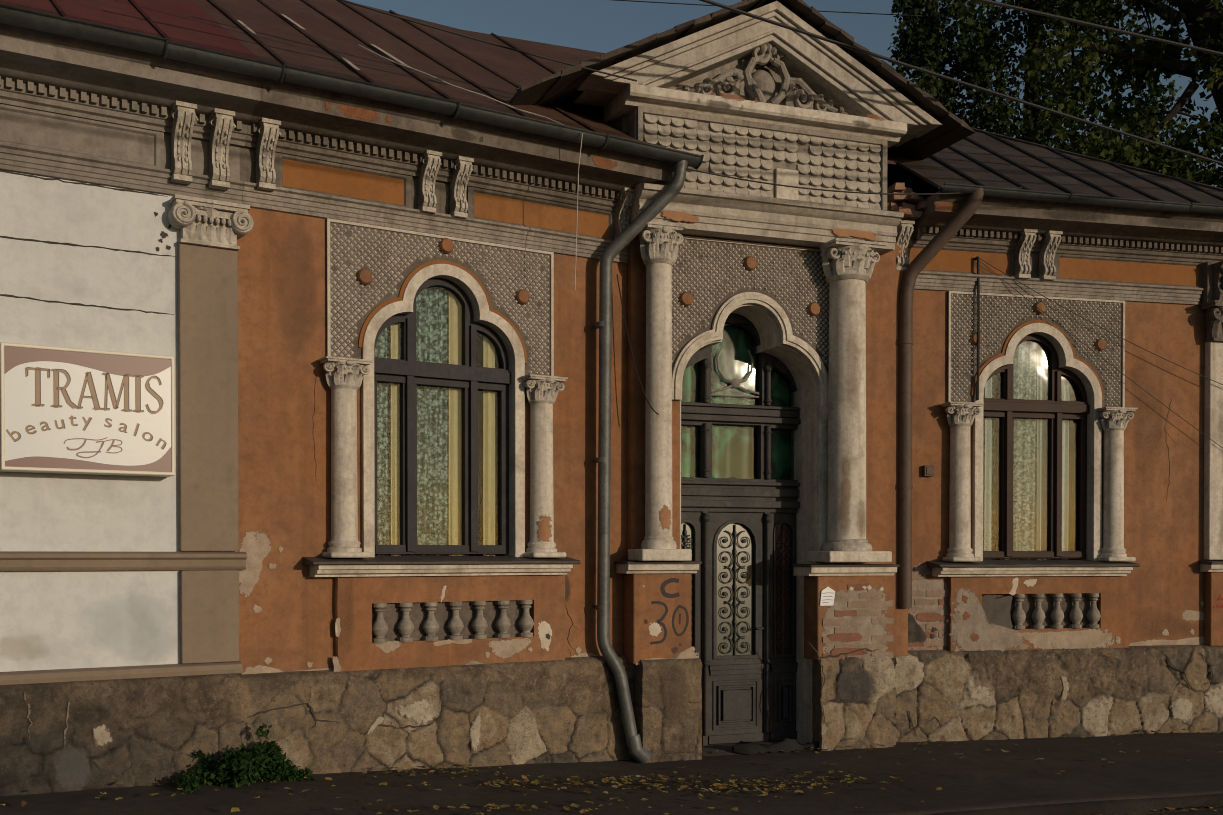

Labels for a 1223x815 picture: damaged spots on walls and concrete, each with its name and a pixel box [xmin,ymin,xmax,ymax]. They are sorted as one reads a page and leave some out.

peeling [537,514,552,542]
peeling [239,531,283,613]
flaking render [465,621,552,665]
flaking render [821,583,894,660]
flaking render [908,561,1204,652]
crack [250,694,339,734]
crack [369,716,440,729]